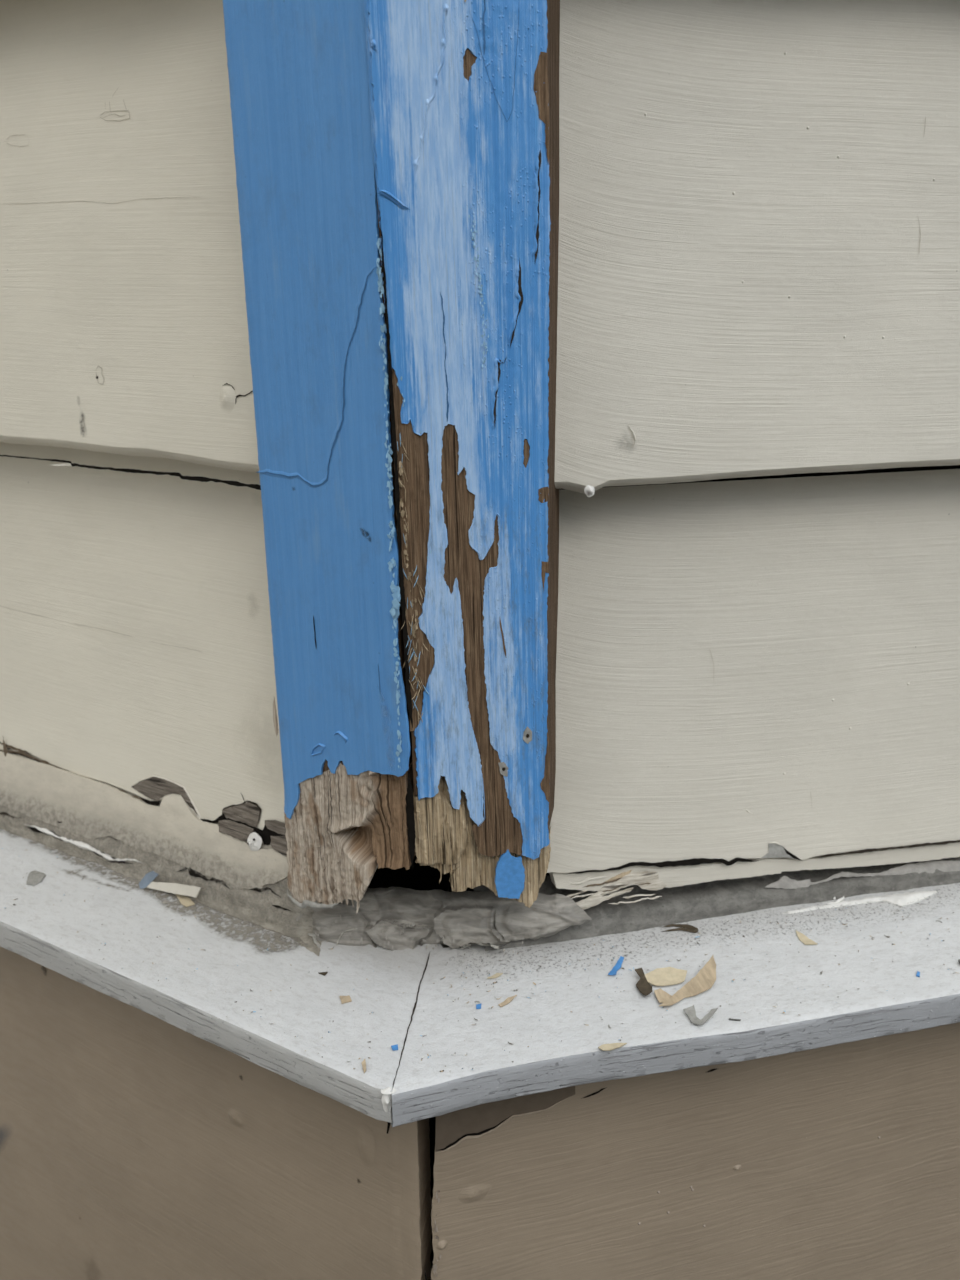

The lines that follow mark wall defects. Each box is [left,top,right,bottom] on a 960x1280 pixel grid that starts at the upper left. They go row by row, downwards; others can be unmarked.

peeling [538,487,549,503]
peeling [392,368,523,857]
peeling [541,561,549,589]
peeling [523,726,550,803]